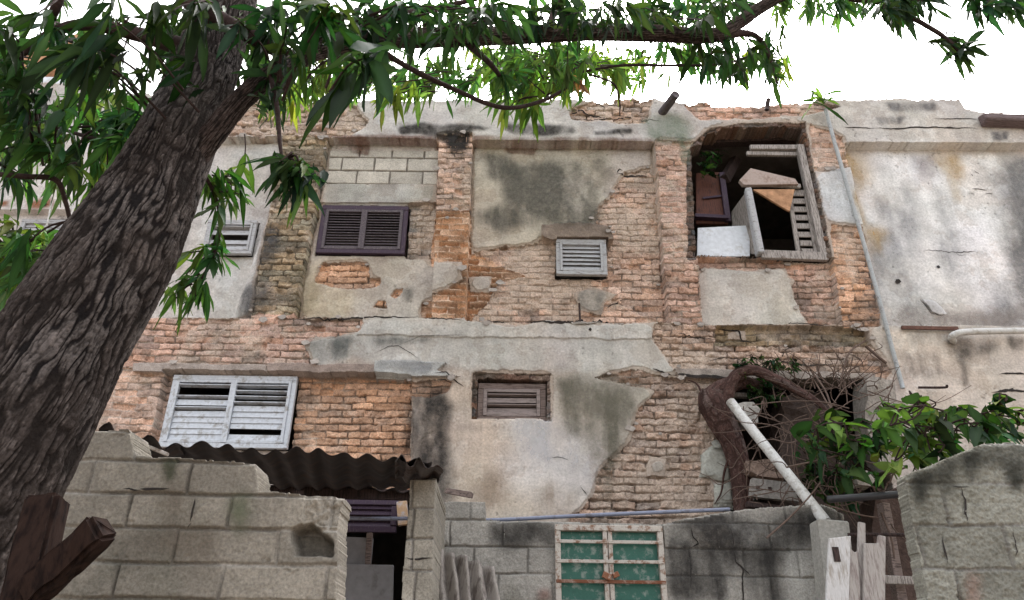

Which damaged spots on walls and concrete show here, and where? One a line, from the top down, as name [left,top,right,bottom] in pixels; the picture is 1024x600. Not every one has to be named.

leakage [485,155,597,228]
spalling [96,102,381,450]
spalling [406,102,892,525]
leakage [410,389,451,496]
leakage [564,383,633,467]
crack [954,486,969,521]